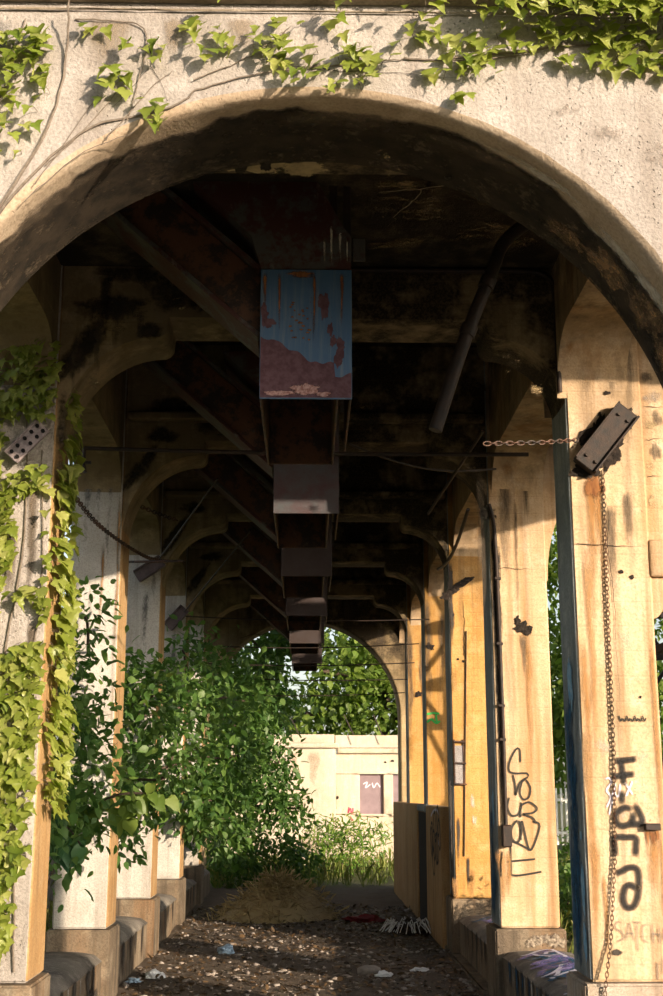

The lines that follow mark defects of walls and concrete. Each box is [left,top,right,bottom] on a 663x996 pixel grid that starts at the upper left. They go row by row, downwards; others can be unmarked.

peeling [507,156,569,195]
peeling [588,230,663,325]
corrosion [263,382,331,397]
water stain [477,476,509,803]
corrosion [581,476,605,726]
corrosion [592,848,608,930]